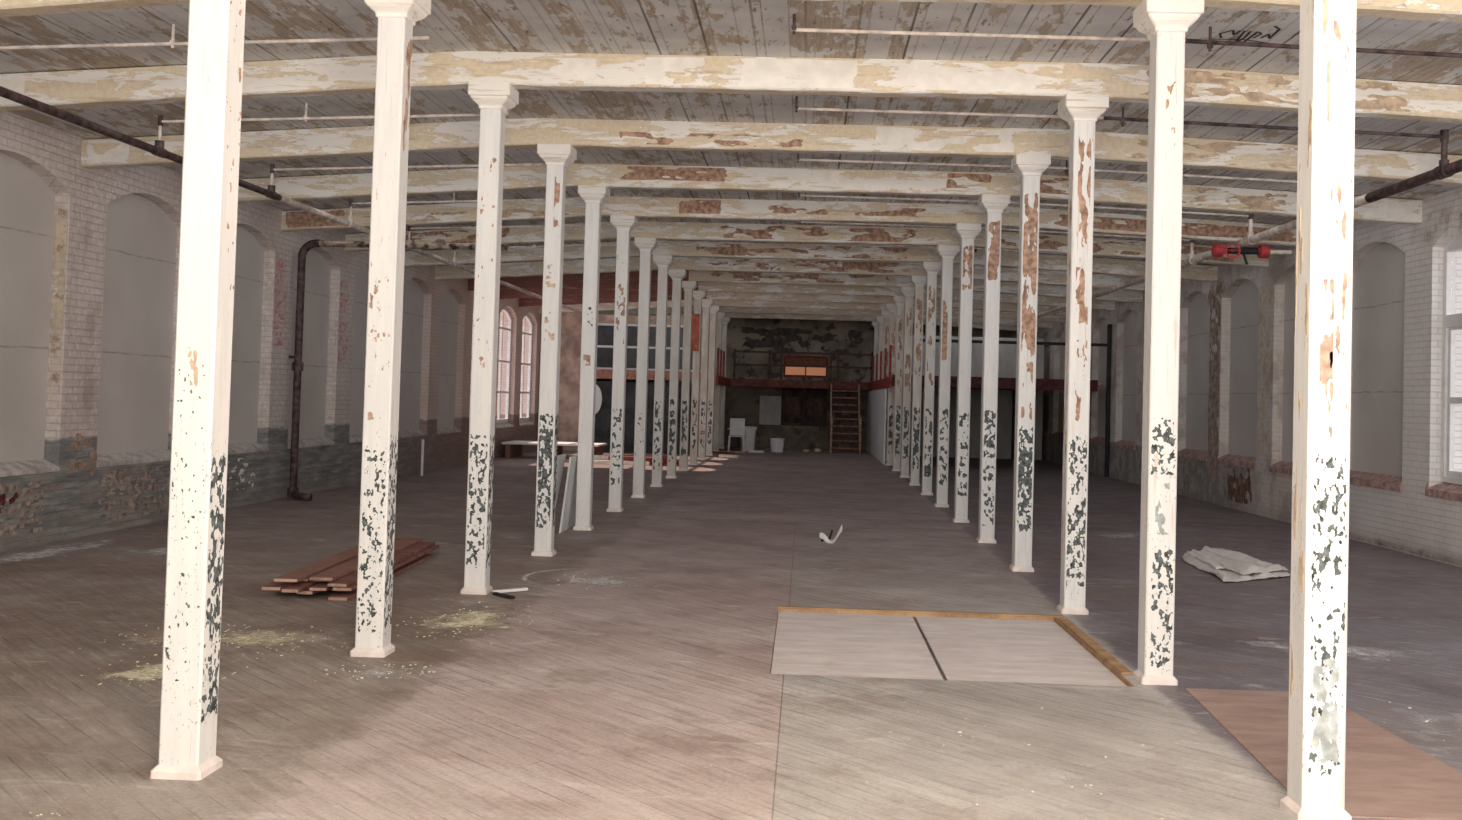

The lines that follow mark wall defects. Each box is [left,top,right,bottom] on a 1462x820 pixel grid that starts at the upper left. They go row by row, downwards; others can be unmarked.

peeling [620,166,727,181]
peeling [619,132,803,147]
peeling [679,169,926,283]
peeling [876,127,1015,152]
peeling [946,173,992,188]
peeling [70,433,255,723]
peeling [358,435,398,633]
peeling [466,435,495,568]
peeling [536,414,558,528]
peeling [1150,418,1176,668]